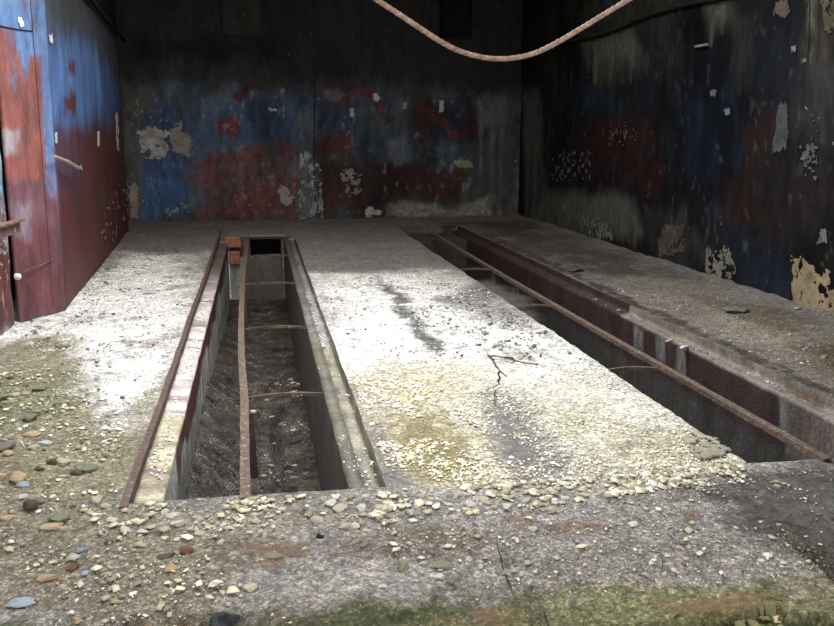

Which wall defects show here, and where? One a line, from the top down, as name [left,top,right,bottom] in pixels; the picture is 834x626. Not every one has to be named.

peeling [820,0,834,34]
peeling [131,111,194,160]
peeling [772,102,790,154]
peeling [269,151,324,219]
peeling [340,168,362,195]
peeling [365,206,382,218]
flaking render [0,173,195,470]
water stain [378,284,446,351]
crack [480,354,508,407]
spalling [0,223,834,626]